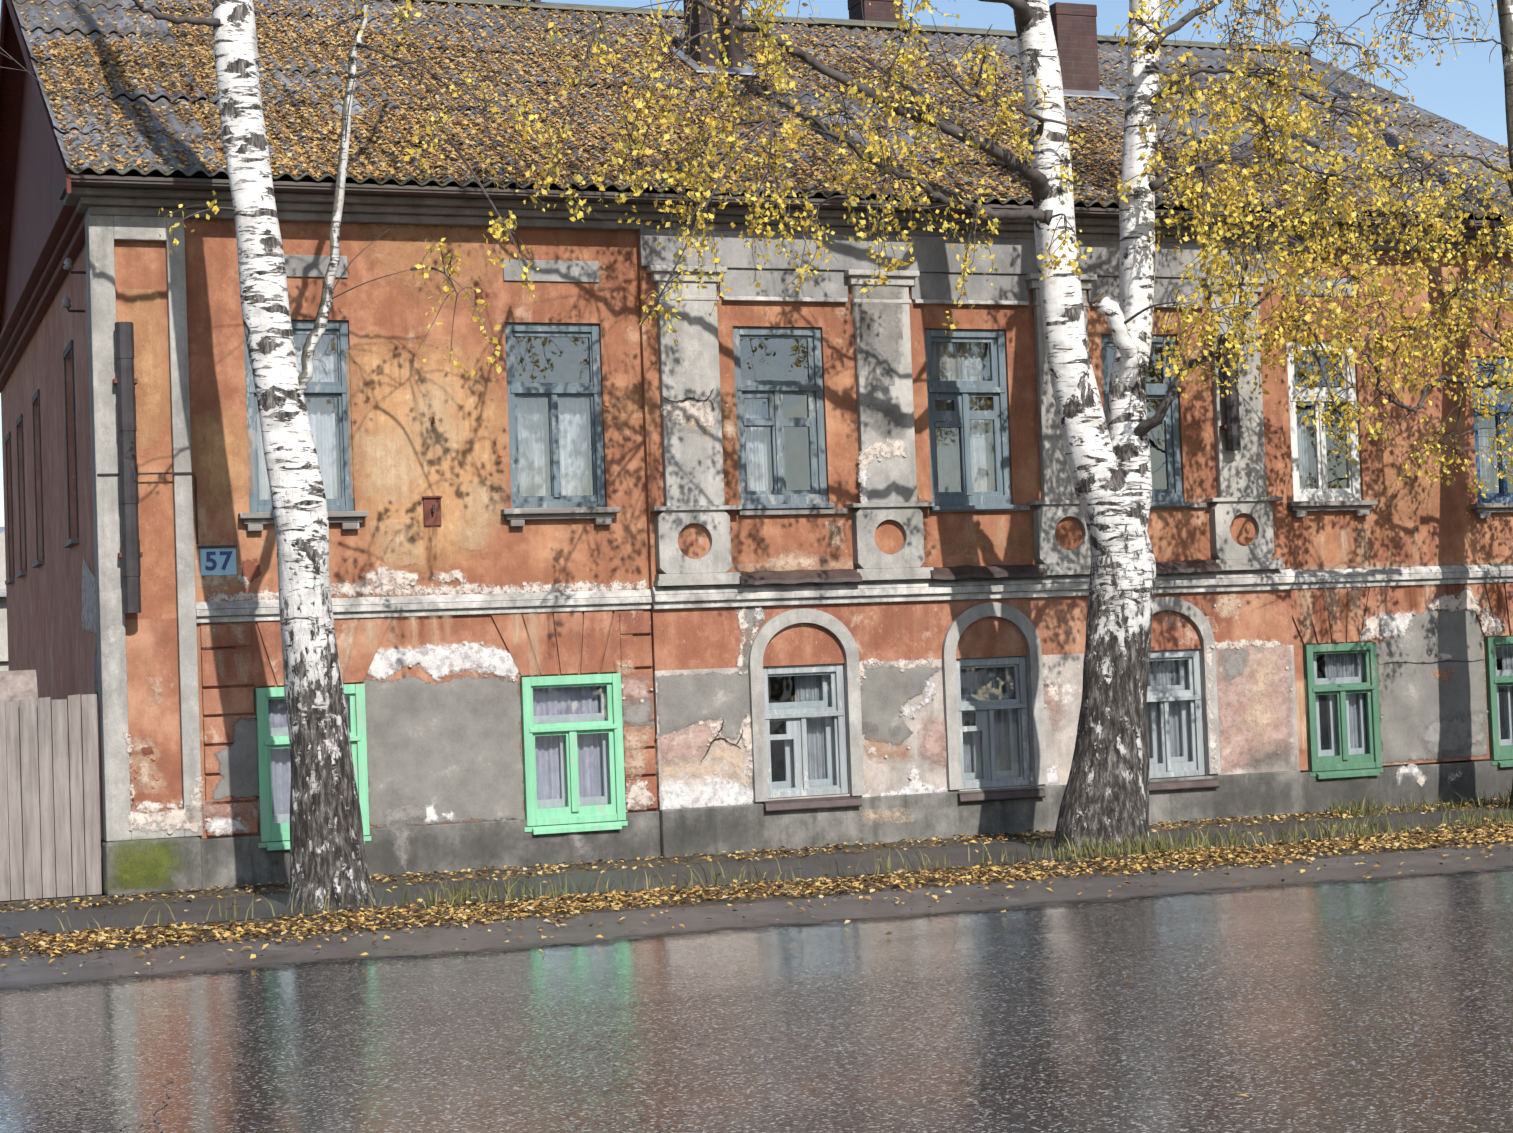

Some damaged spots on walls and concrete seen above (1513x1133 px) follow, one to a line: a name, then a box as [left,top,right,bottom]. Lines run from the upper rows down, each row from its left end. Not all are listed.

peeling [330,339,647,597]
flaking render [663,399,737,483]
flaking render [195,547,279,602]
flaking render [122,715,260,836]
flaking render [361,641,525,828]
flaking render [618,606,765,812]
crack [701,719,743,762]
flaking render [859,657,953,796]
flaking render [1360,585,1505,764]